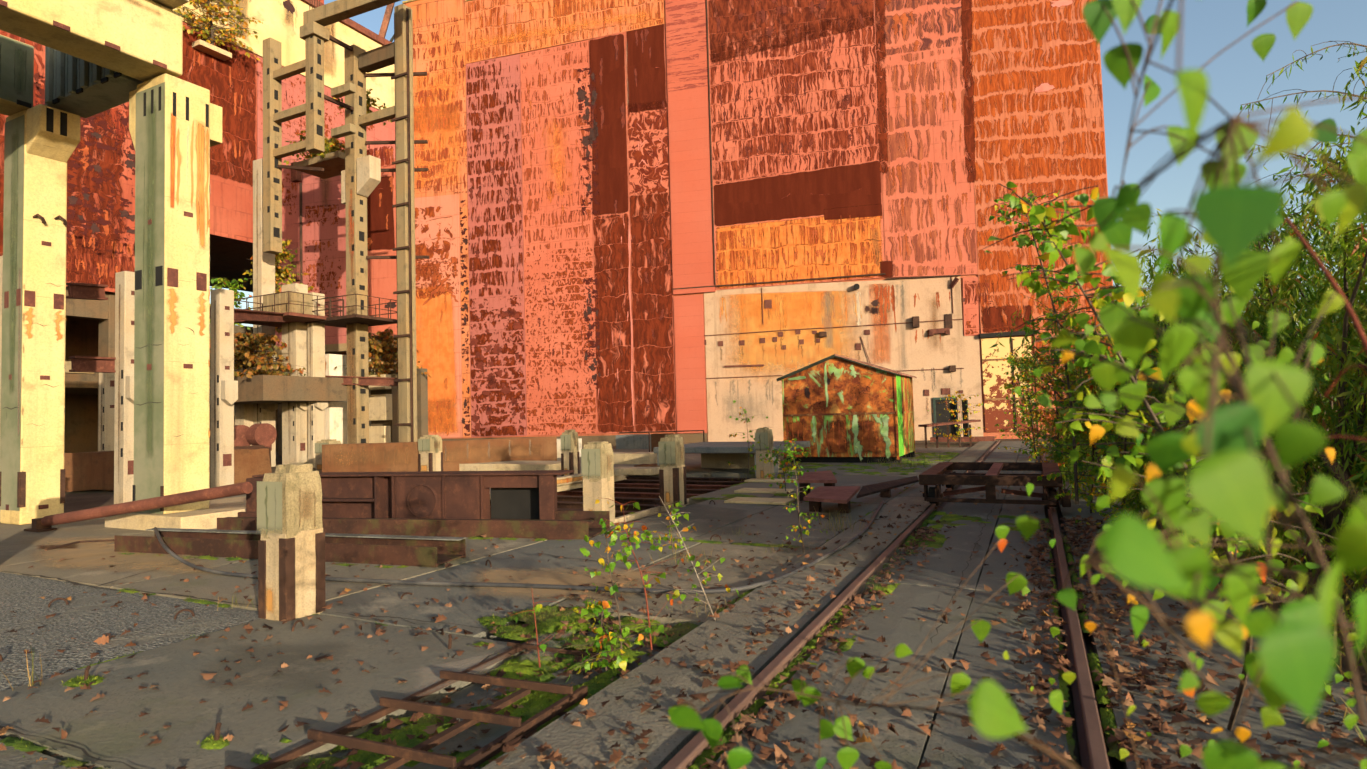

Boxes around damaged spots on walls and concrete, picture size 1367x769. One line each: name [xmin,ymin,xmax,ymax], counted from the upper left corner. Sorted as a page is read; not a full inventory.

corrosion [170,29,256,247]
corrosion [66,109,125,288]
corrosion [708,0,897,453]
corrosion [914,292,951,342]
peeling [811,363,828,442]
peeling [852,414,891,461]
corrosion [901,378,928,447]